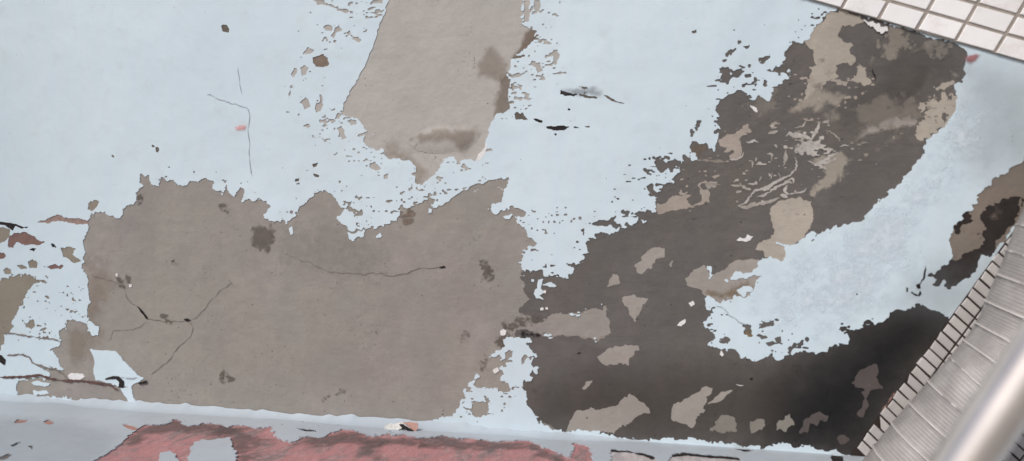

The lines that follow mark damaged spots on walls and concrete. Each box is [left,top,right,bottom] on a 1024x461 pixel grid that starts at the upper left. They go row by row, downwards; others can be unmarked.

crack [208,73,252,174]
peeling [320,0,566,191]
crack [0,275,231,391]
peeling [0,174,611,422]
crack [281,250,446,277]
peeling [515,8,968,449]
damp [787,308,946,449]
peeling [928,161,1024,290]
peeling [159,437,238,461]
peeling [810,433,866,455]